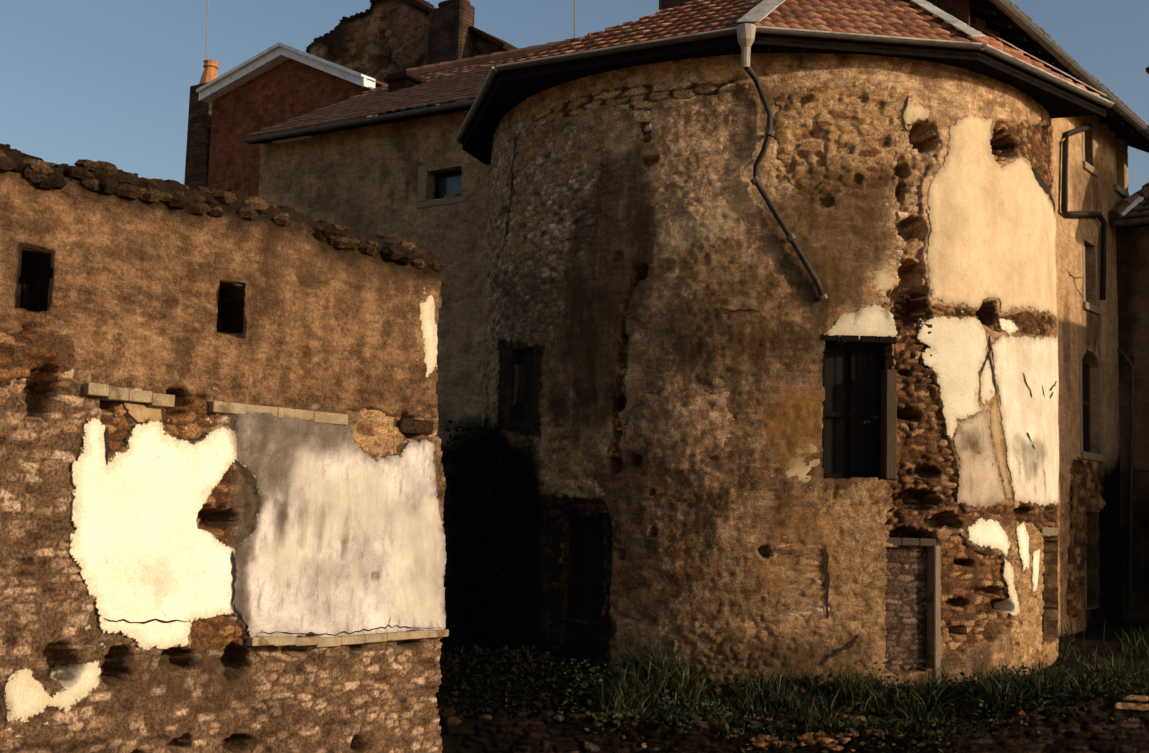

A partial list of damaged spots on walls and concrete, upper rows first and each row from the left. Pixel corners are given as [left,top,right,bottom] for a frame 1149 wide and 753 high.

leakage [569,149,654,425]
peeling [761,80,1106,658]
peeling [3,385,446,737]
leakage [211,412,352,613]
crack [778,545,830,620]
crack [822,635,859,665]